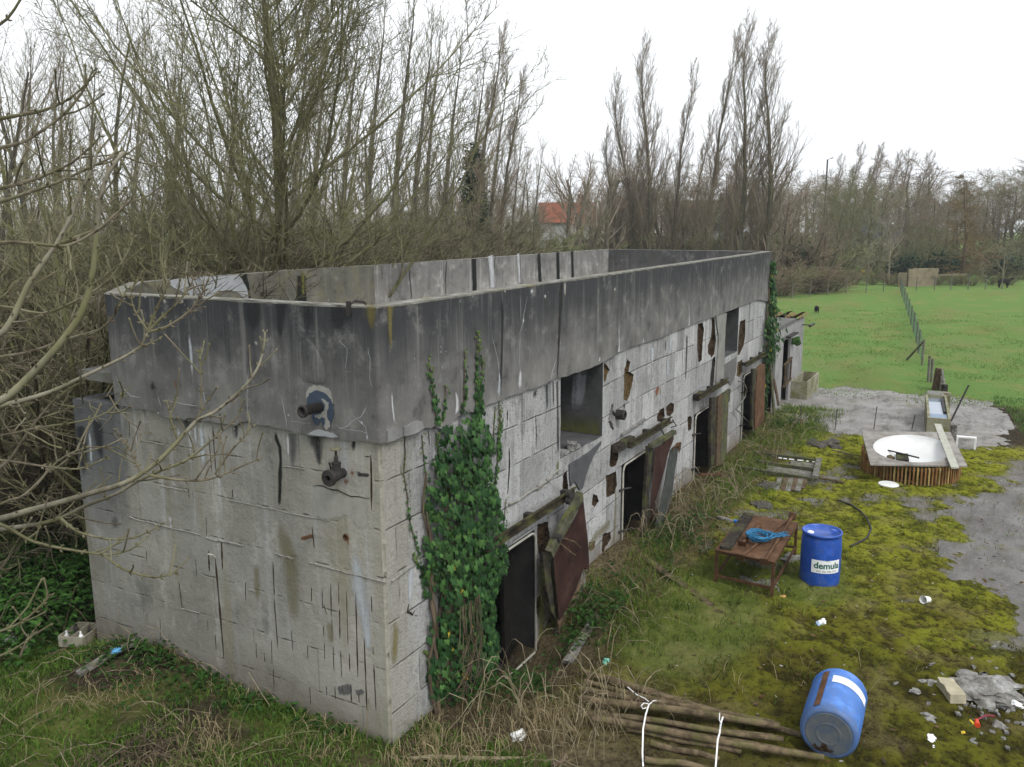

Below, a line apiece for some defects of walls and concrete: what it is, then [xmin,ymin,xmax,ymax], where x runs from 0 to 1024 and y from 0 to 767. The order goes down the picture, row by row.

spalling [697,318,716,362]
spalling [737,320,745,377]
spalling [592,359,634,507]